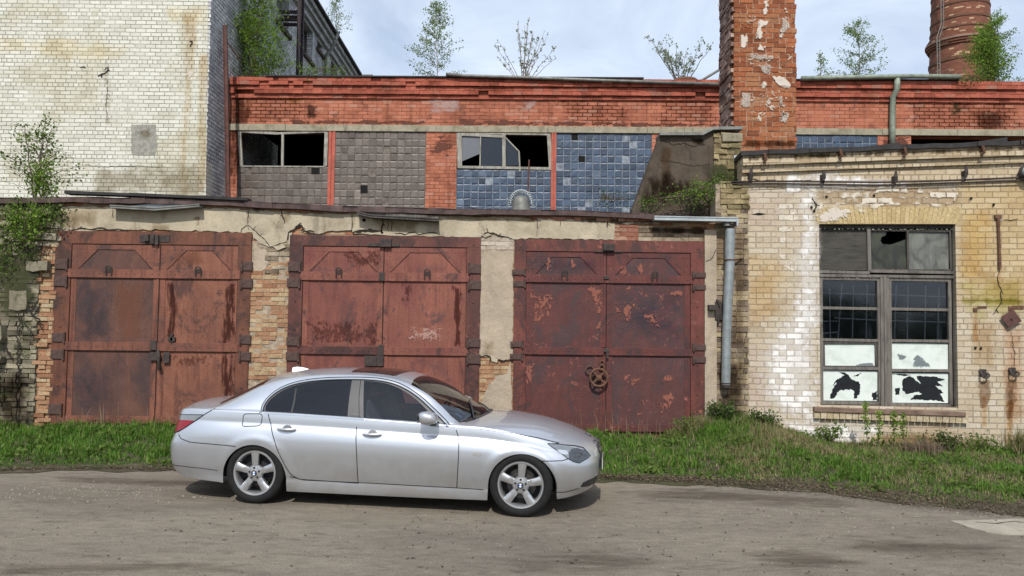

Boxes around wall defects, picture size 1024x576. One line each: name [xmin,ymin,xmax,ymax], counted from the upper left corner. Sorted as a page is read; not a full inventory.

crack [241,210,314,247]
peeling [811,187,958,230]
spalling [264,232,292,273]
peeling [587,287,635,340]
peeling [644,290,682,327]
spalling [479,357,510,400]
peeling [659,375,674,413]